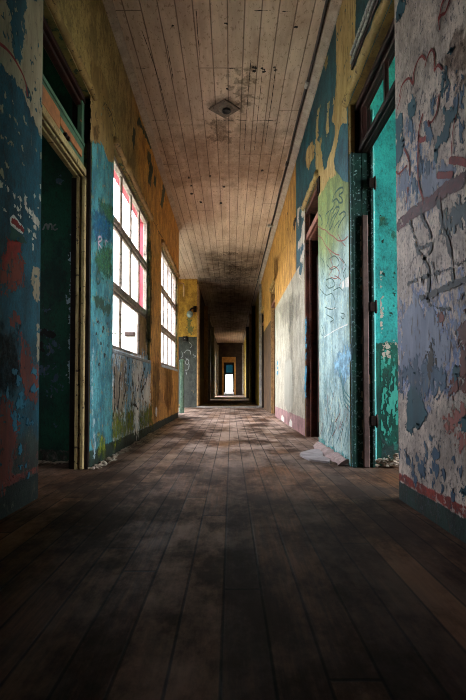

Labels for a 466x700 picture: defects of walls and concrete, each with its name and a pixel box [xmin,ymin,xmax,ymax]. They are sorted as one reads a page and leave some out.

peeling [0,0,43,139]
peeling [396,0,407,23]
peeling [0,160,41,250]
peeling [0,236,51,313]
damp [203,254,260,331]
peeling [396,65,465,219]
peeling [438,191,466,237]
peeling [0,310,70,497]
peeling [90,321,157,459]
peeling [380,271,466,502]